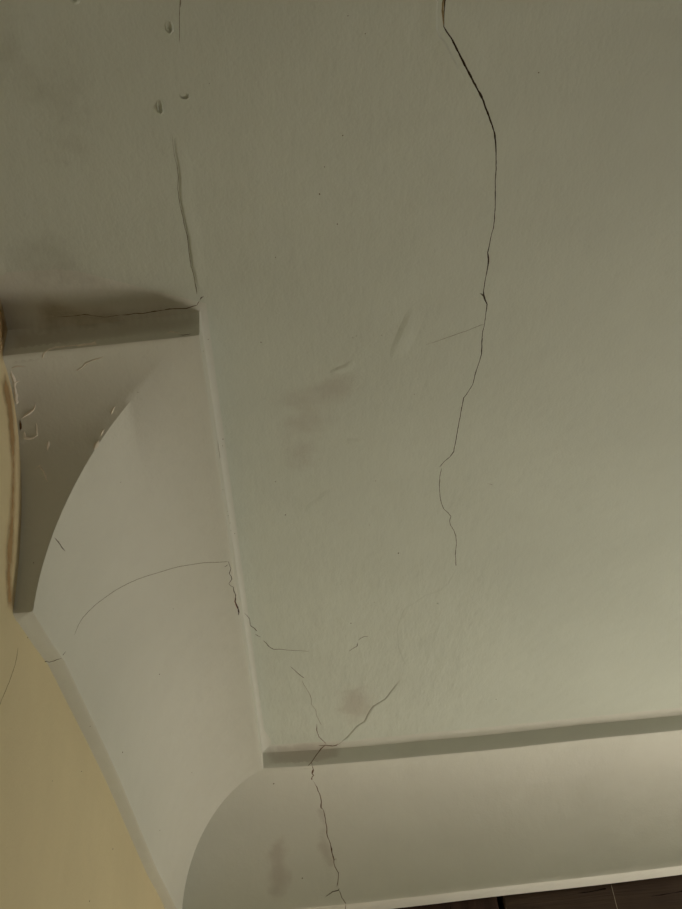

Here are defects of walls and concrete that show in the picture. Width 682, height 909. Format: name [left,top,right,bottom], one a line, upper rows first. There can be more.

crack [420,0,497,560]
crack [74,562,346,909]